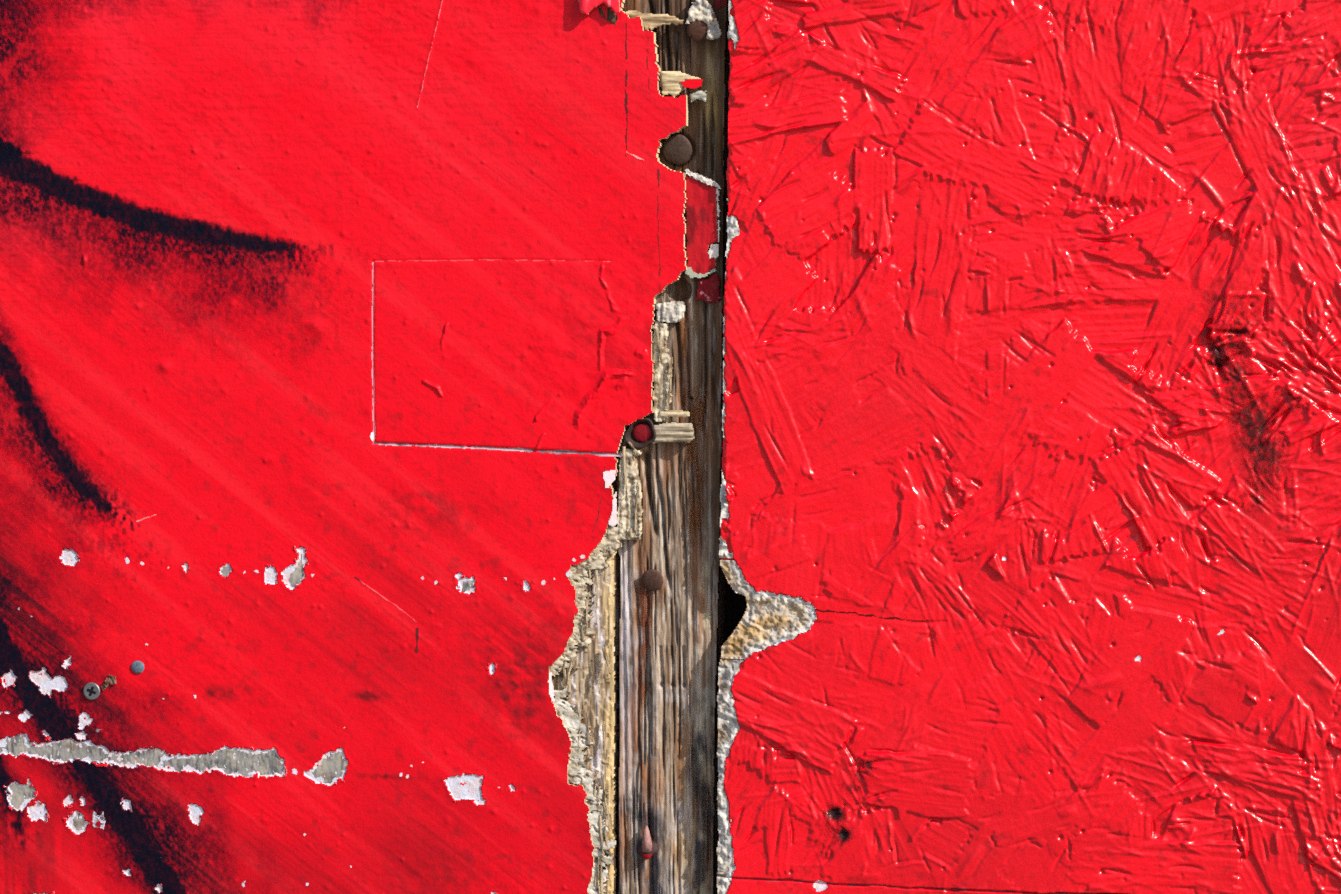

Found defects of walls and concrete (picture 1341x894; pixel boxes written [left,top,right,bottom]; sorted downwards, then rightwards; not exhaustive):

spalling [727,0,739,49]
peeling [681,79,703,89]
spalling [685,169,740,279]
peeling [603,470,618,527]
peeling [219,546,315,590]
peeling [1,656,72,698]
spalling [717,470,817,894]
peeling [0,709,348,786]
peeling [3,778,106,834]
peeling [188,803,204,825]
peeling [444,773,486,806]